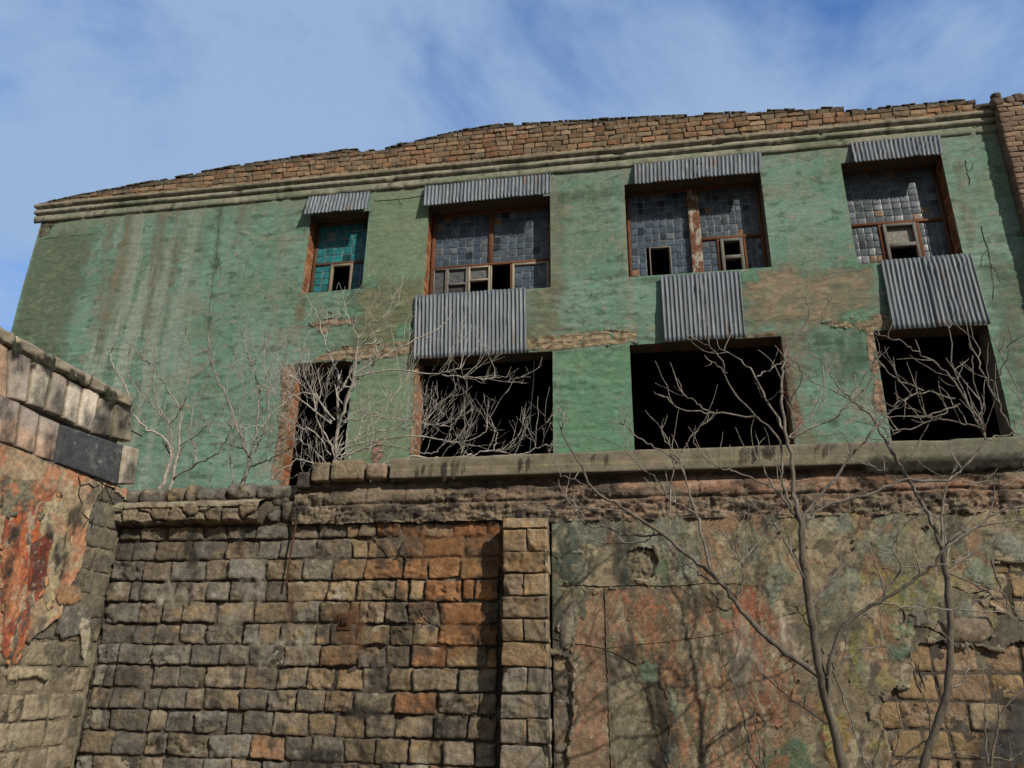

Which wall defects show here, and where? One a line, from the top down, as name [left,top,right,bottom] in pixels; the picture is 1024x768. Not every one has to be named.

peeling [309,276,421,455]
peeling [740,258,891,439]
peeling [0,475,82,681]
spalling [291,463,1024,768]
crack [552,550,797,768]